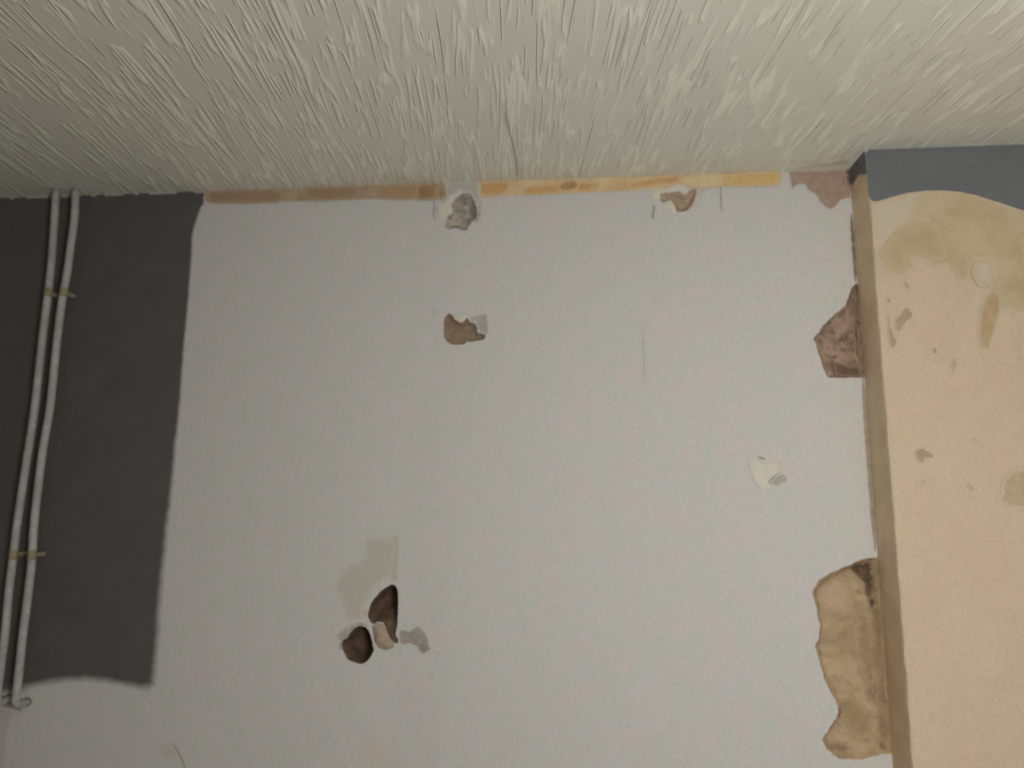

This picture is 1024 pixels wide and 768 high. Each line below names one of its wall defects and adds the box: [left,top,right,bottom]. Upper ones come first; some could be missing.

spalling [433,182,482,236]
spalling [649,183,723,218]
peeling [787,170,851,210]
leakage [875,190,1024,359]
spalling [429,311,490,345]
spalling [813,284,865,378]
spalling [334,584,451,664]
spalling [812,557,892,760]